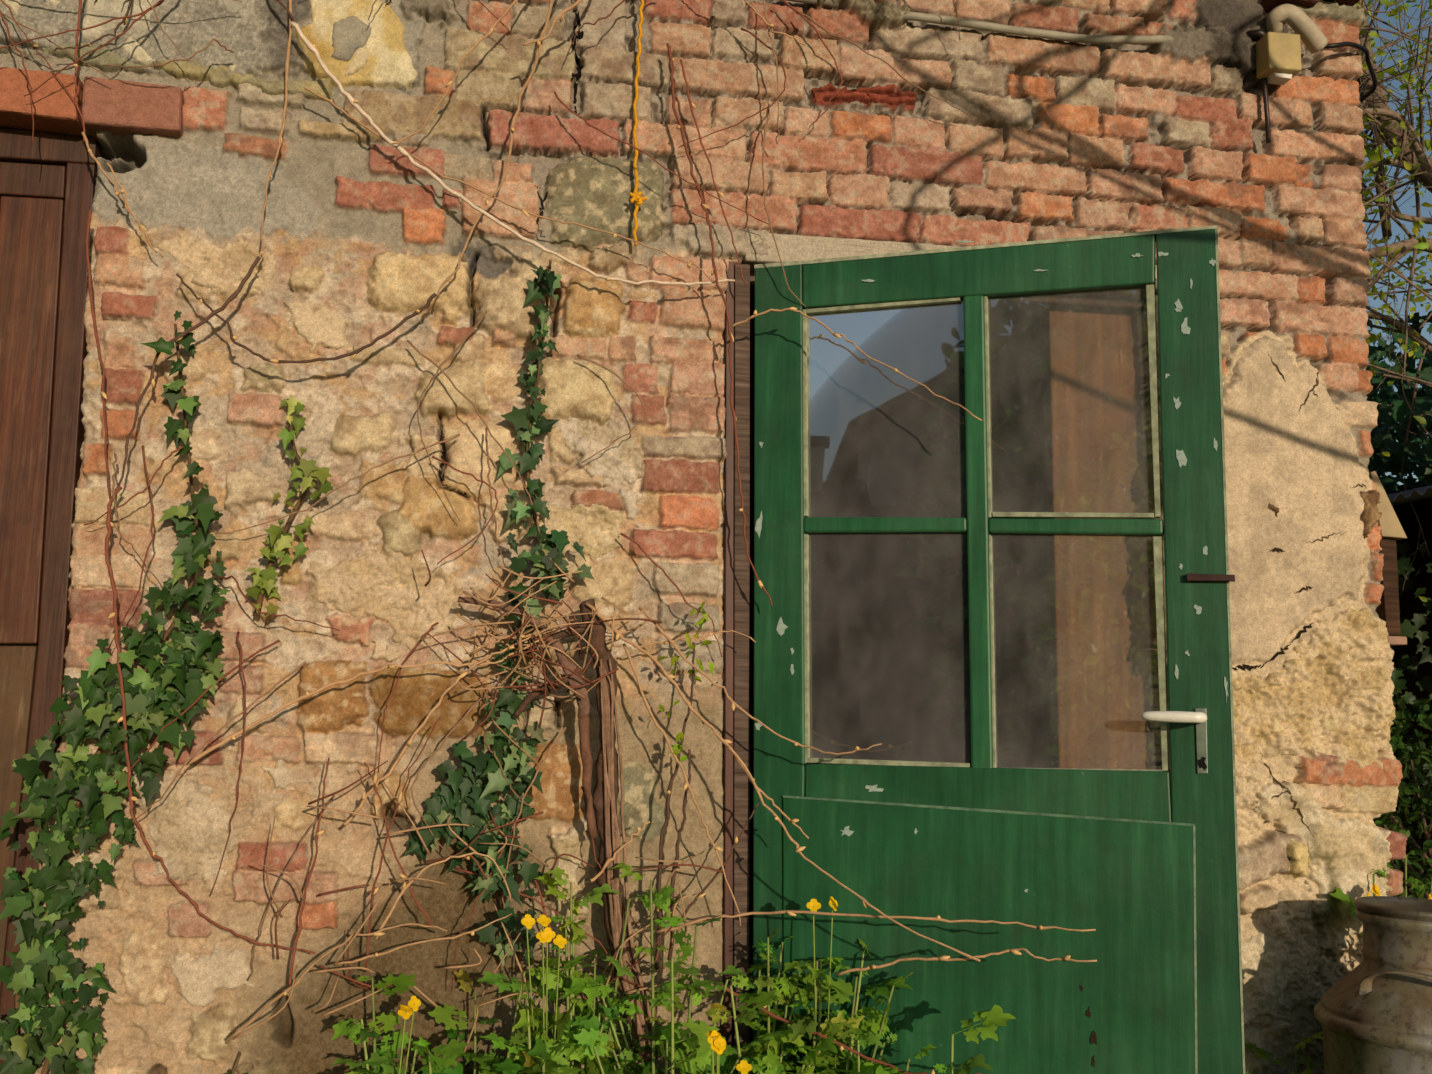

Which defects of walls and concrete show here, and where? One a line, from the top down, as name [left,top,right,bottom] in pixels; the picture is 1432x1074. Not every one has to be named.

flaking render [80,0,155,70]
flaking render [296,0,418,88]
crack [571,0,584,115]
flaking render [151,231,276,304]
crack [439,420,468,497]
flaking render [526,417,645,588]
crack [1270,532,1346,553]
flaking render [304,548,470,662]
crack [1232,586,1314,671]
flaking render [1224,607,1396,769]
flaking render [132,771,240,884]
flaking render [1253,781,1393,956]